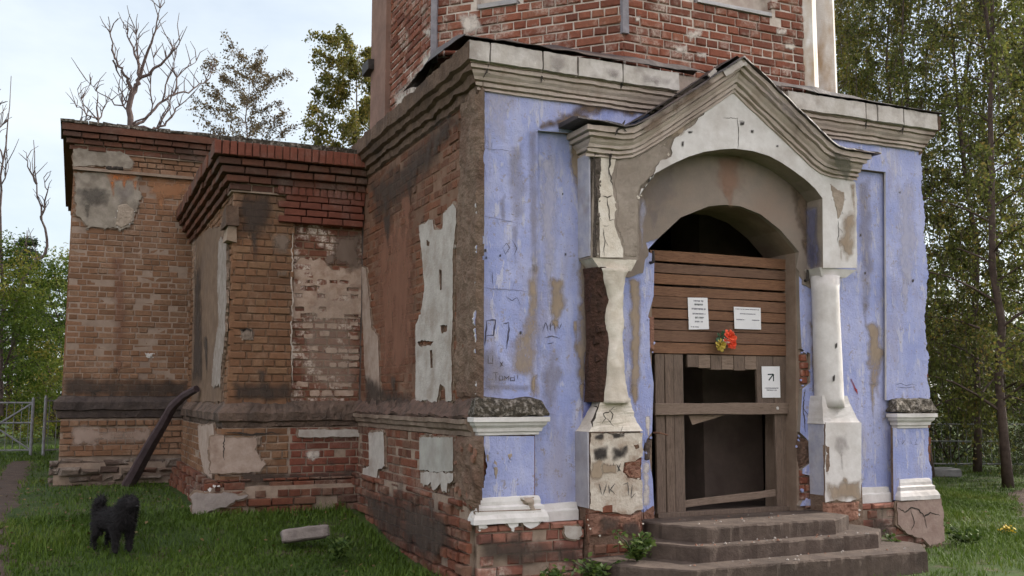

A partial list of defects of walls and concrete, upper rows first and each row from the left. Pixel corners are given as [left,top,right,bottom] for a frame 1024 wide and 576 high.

peeling [72,148,143,232]
leakage [365,119,457,405]
spalling [415,81,487,403]
crack [593,120,627,253]
spalling [830,184,847,219]
leakage [65,271,207,397]
peeling [291,256,382,400]
peeling [189,422,266,514]
crack [899,507,940,530]